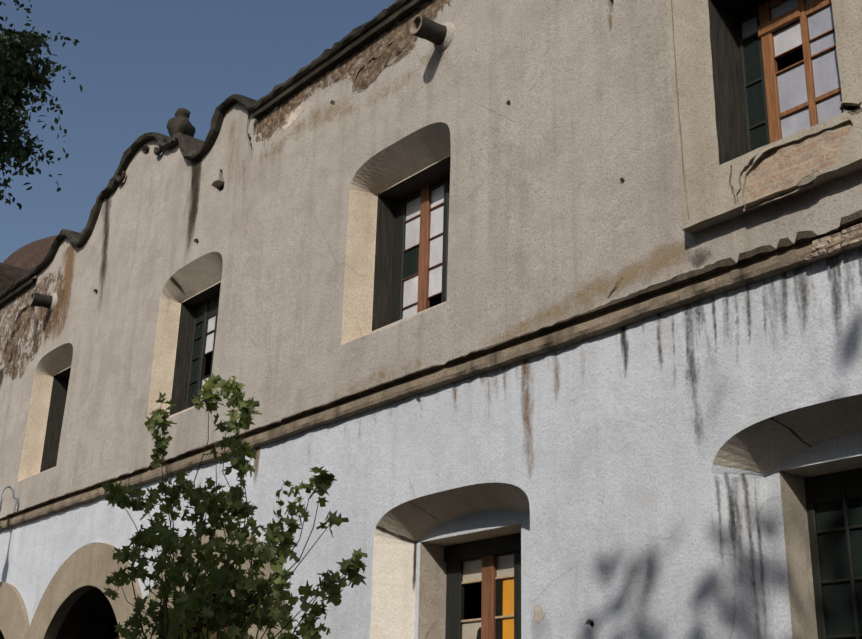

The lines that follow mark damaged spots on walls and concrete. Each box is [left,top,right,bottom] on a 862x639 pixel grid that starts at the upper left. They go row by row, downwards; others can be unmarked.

flaking render [0,267,65,380]